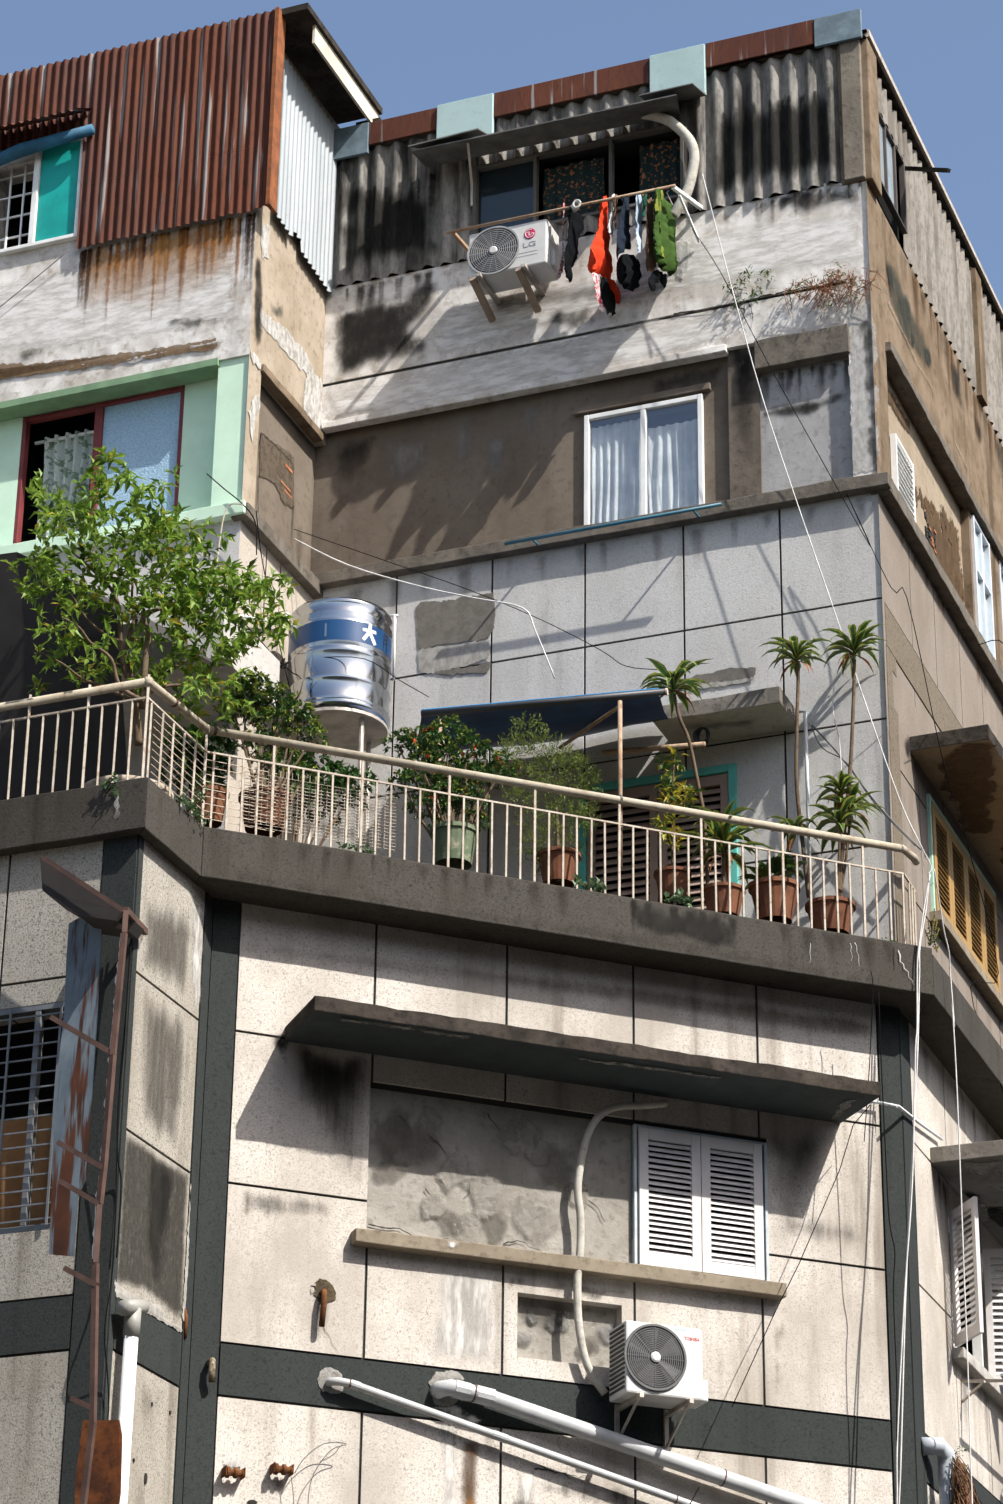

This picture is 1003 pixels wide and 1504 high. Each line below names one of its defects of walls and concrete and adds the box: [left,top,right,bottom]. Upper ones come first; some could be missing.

water stain [717,87,831,191]
corrosion [78,212,256,302]
water stain [339,173,435,268]
water stain [756,181,861,209]
water stain [251,224,322,431]
water stain [341,272,432,371]
water stain [248,394,260,441]
spalling [259,432,295,508]
peeling [915,486,965,603]
water stain [150,905,203,1000]
water stain [118,1140,186,1311]